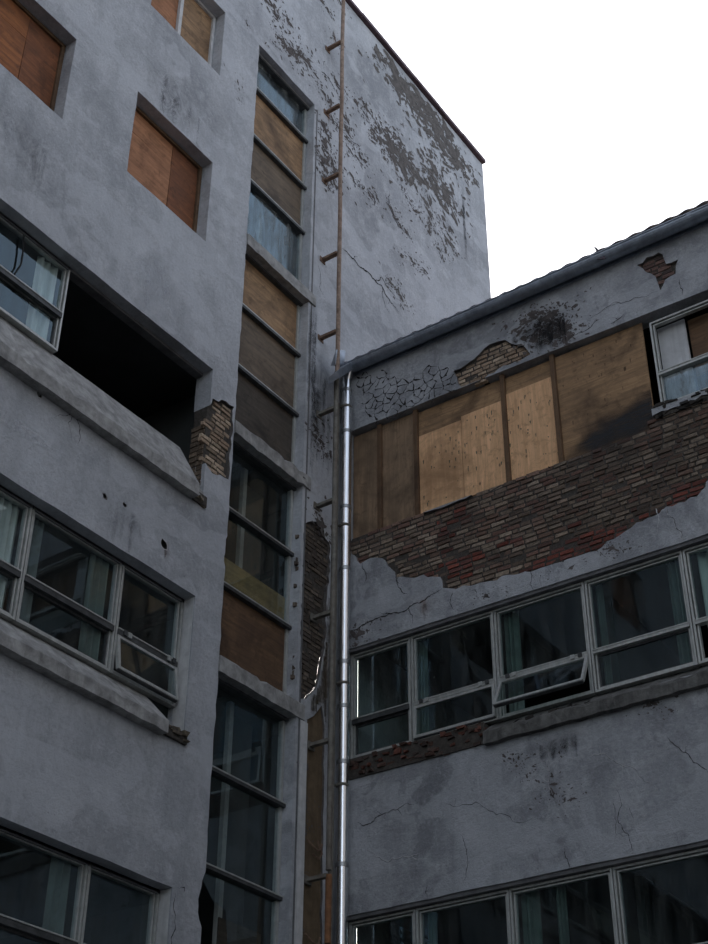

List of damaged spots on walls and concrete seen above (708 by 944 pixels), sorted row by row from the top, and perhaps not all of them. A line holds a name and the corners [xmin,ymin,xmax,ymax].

peeling [261,0,482,280]
peeling [385,277,414,314]
flaking render [456,287,599,387]
flaking render [639,255,677,288]
crack [356,365,457,424]
flaking render [189,401,231,485]
peeling [305,417,333,469]
flaking render [351,401,708,605]
flaking render [290,495,332,699]